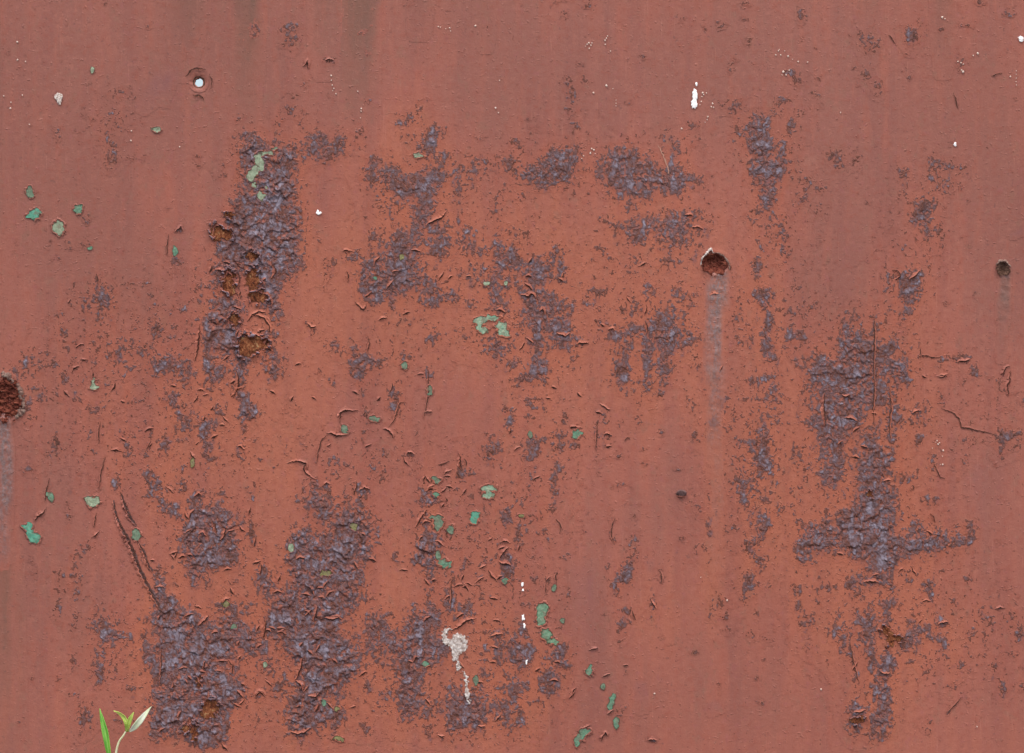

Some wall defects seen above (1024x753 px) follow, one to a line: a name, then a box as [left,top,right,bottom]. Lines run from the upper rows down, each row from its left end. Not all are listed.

peeling [245,146,279,202]
peeling [472,313,511,338]
crack [941,408,996,435]